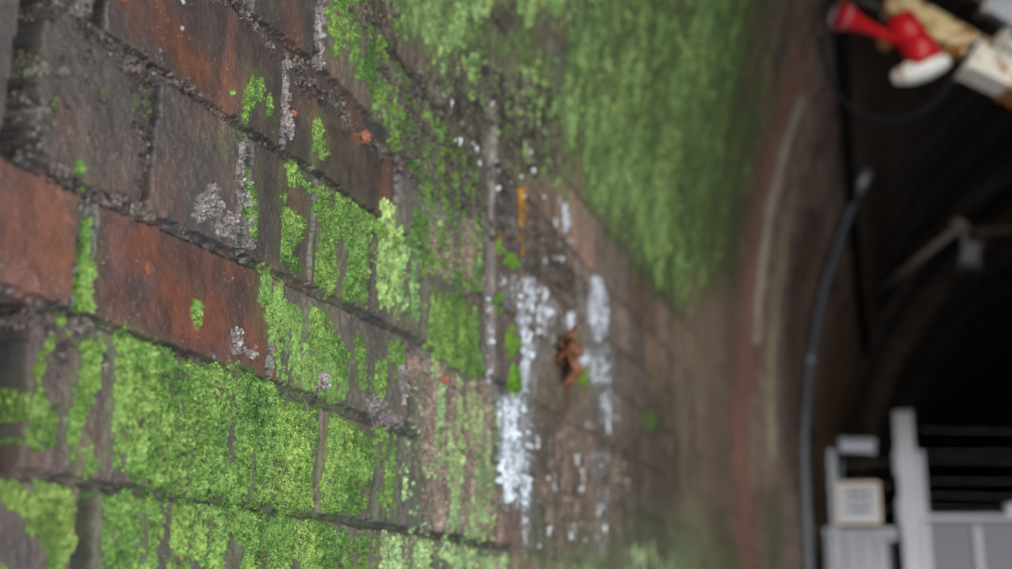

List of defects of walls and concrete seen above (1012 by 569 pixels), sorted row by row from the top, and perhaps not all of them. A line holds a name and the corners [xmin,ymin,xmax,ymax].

water stain [481,107,619,550]
water stain [730,46,809,569]